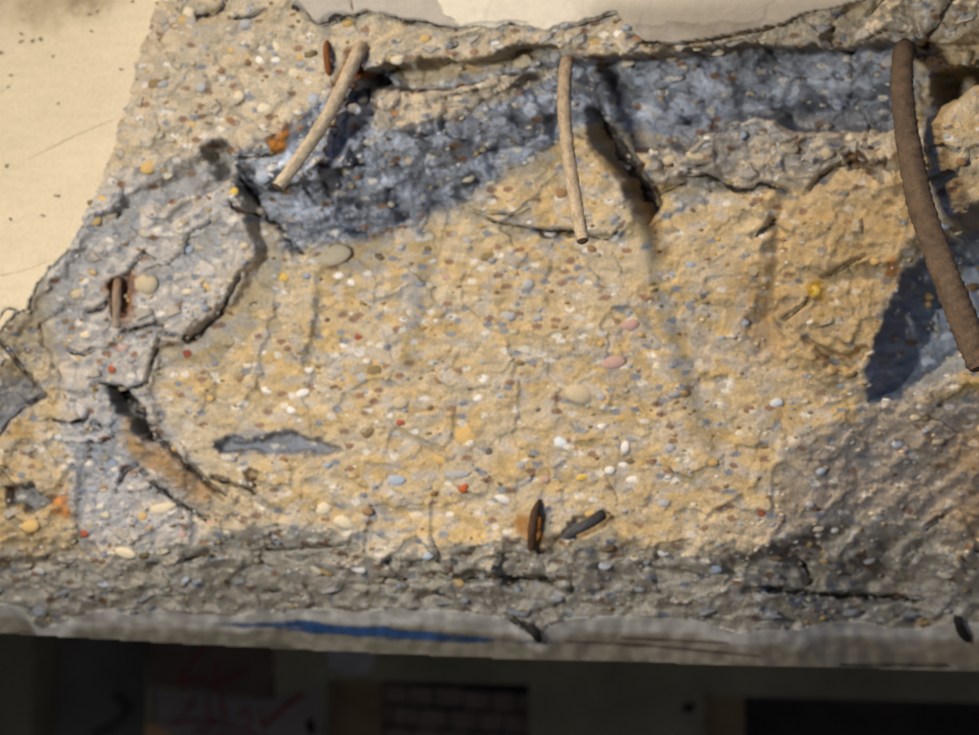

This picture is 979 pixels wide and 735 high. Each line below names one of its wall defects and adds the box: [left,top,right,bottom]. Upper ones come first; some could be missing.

rust [354,65,380,80]
crack [237,150,285,188]
crack [603,118,853,211]
crack [231,206,283,228]
crack [86,299,112,314]
rust [103,278,135,321]
spalling [0,0,979,564]
crack [93,273,257,497]
crack [119,465,207,522]
rust [518,515,546,544]